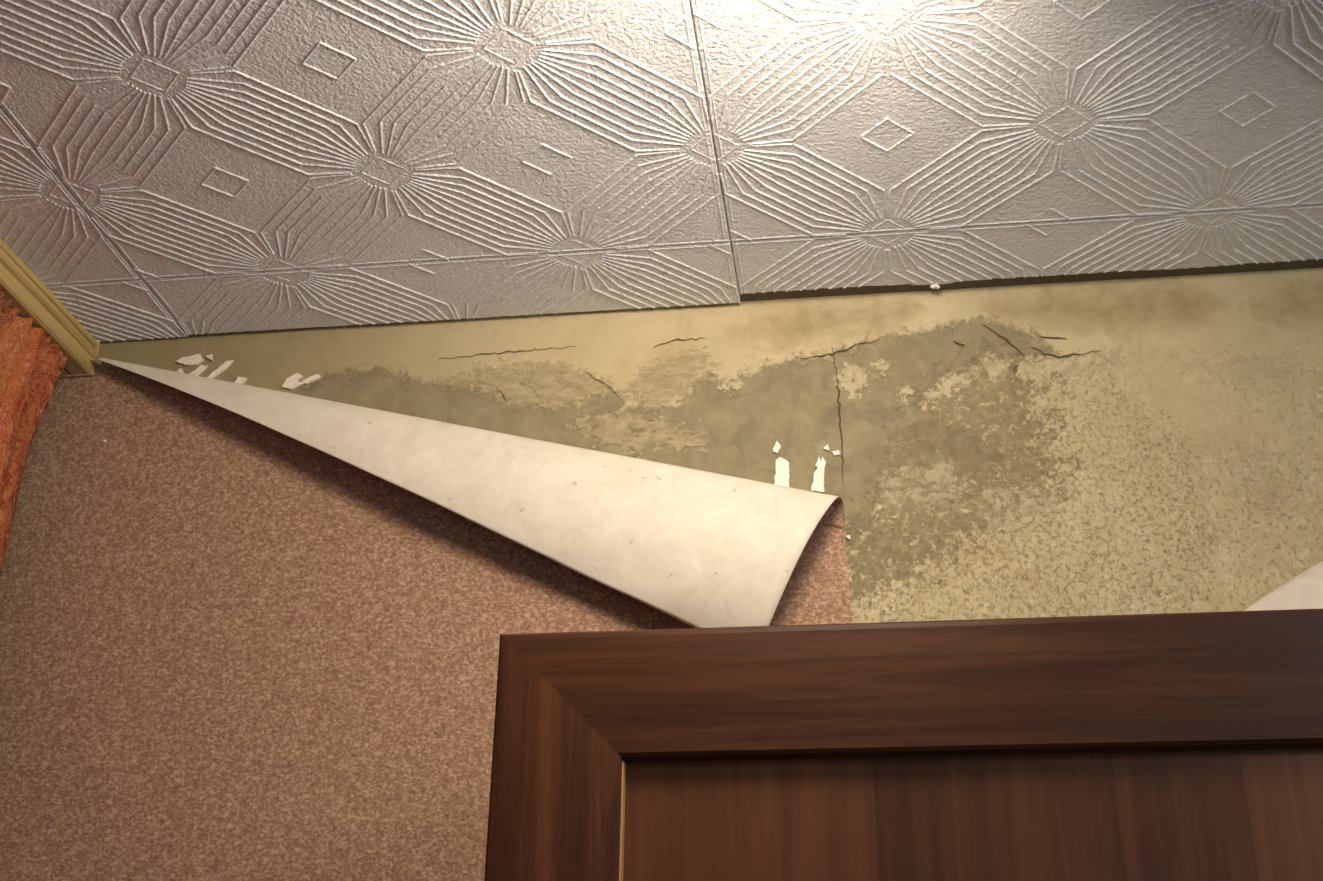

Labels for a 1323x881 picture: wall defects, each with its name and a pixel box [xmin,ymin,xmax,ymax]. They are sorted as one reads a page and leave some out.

peeling [175,354,248,384]
peeling [282,373,321,390]
flaking render [434,344,744,455]
crack [800,339,879,479]
water stain [297,316,1080,615]